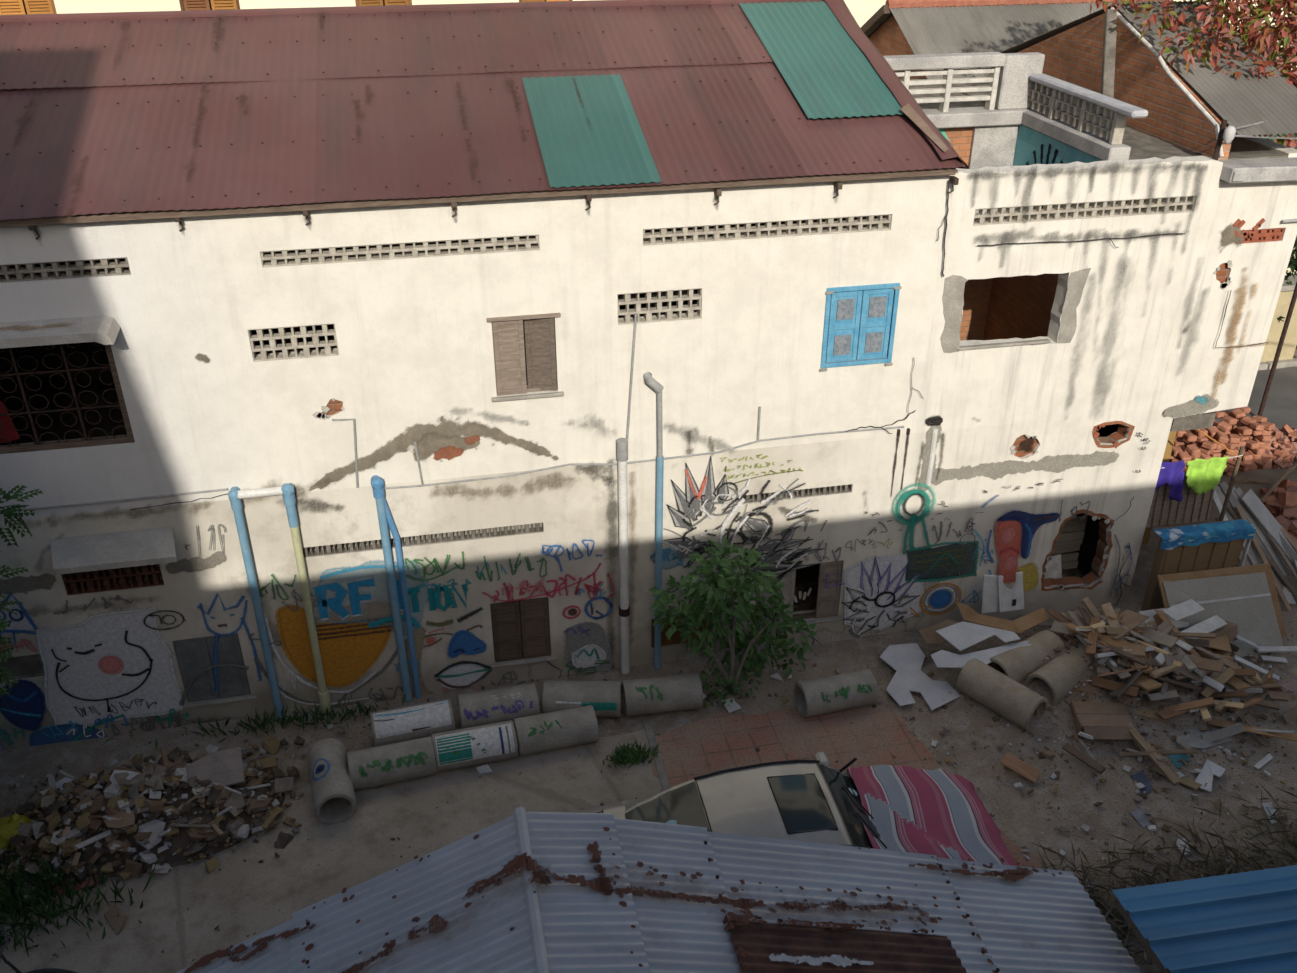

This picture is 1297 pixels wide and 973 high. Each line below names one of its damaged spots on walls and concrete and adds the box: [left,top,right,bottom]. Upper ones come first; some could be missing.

leakage [1017,169,1063,195]
leakage [1081,165,1120,190]
leakage [1164,164,1203,206]
leakage [978,216,1028,243]
spalling [1214,218,1265,289]
flaking render [309,416,559,491]
spalling [1010,435,1038,457]
spalling [1092,421,1135,448]
corrosion [183,902,326,973]
corrosion [342,914,448,973]
corrosion [463,827,966,973]
corrosion [908,856,1062,973]